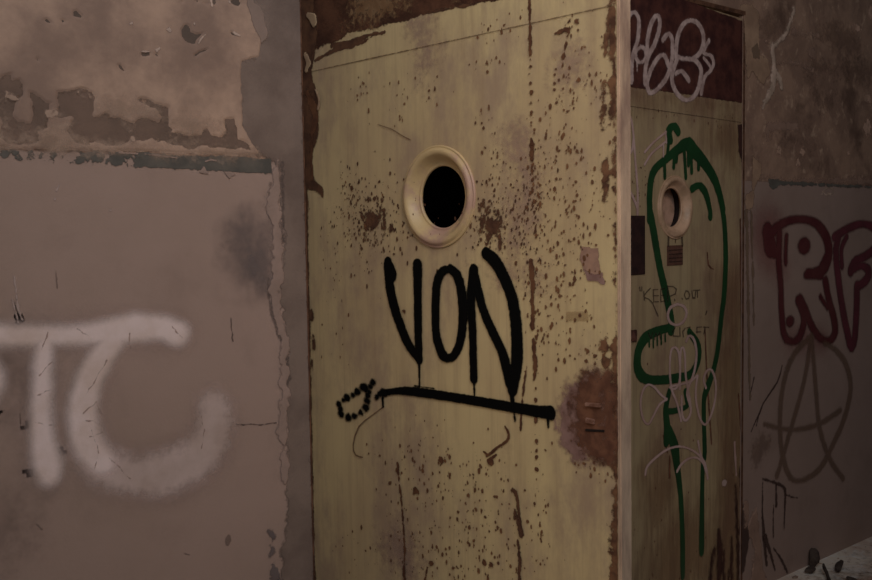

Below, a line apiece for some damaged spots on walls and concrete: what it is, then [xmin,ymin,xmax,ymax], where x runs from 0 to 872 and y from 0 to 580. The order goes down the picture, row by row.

flaking render [0,0,268,174]
corrosion [301,0,496,521]
corrosion [366,437,550,580]
corrosion [454,0,618,580]